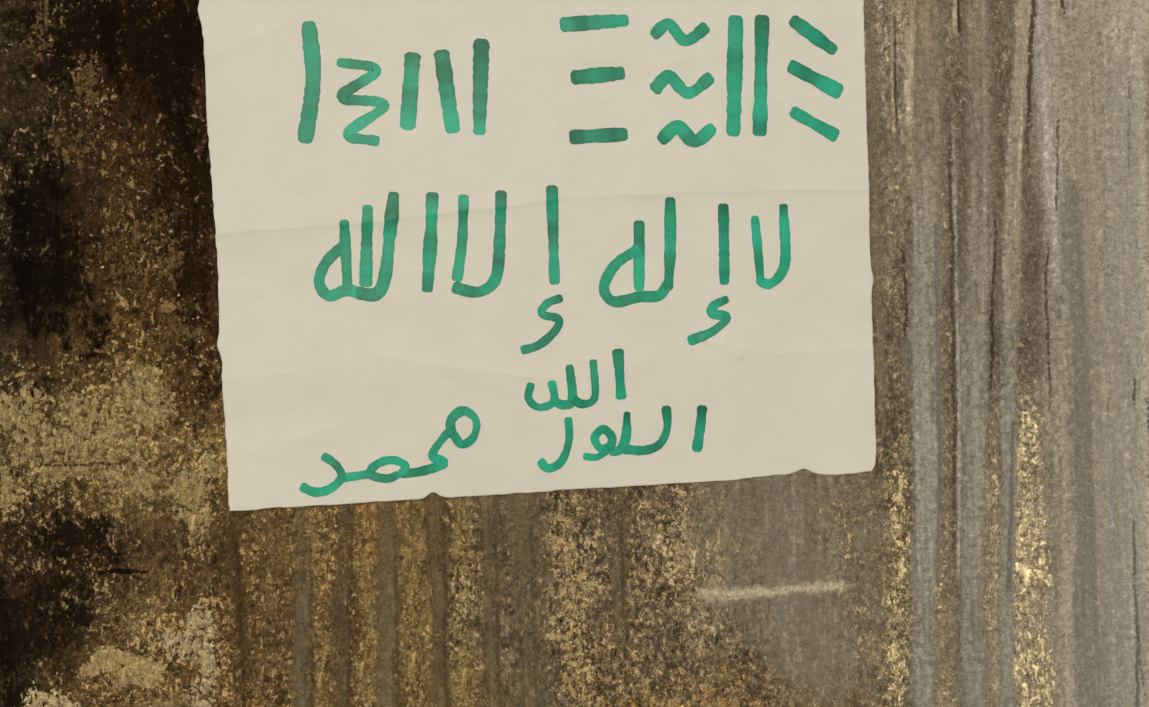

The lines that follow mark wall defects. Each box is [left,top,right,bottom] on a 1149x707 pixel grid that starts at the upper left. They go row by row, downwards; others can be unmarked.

leakage [0,0,218,362]
leakage [864,0,886,428]
leakage [894,0,1149,707]
crack [1133,377,1149,428]
leakage [0,514,127,707]
crack [1133,520,1146,707]